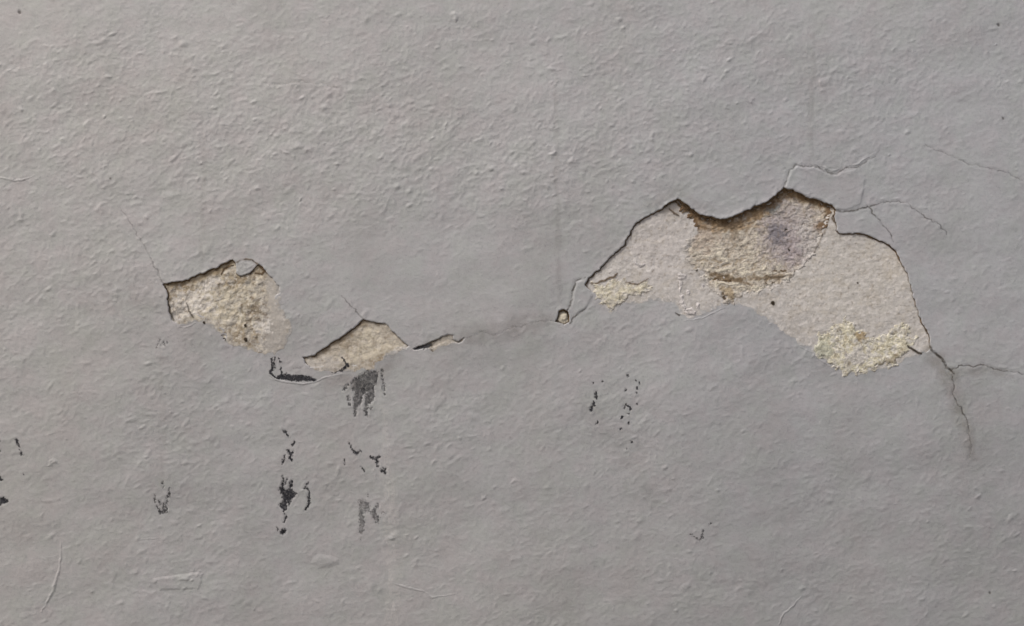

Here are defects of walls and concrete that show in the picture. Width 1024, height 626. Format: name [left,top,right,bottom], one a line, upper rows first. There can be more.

spalling [163,258,464,416]
spalling [585,188,930,377]